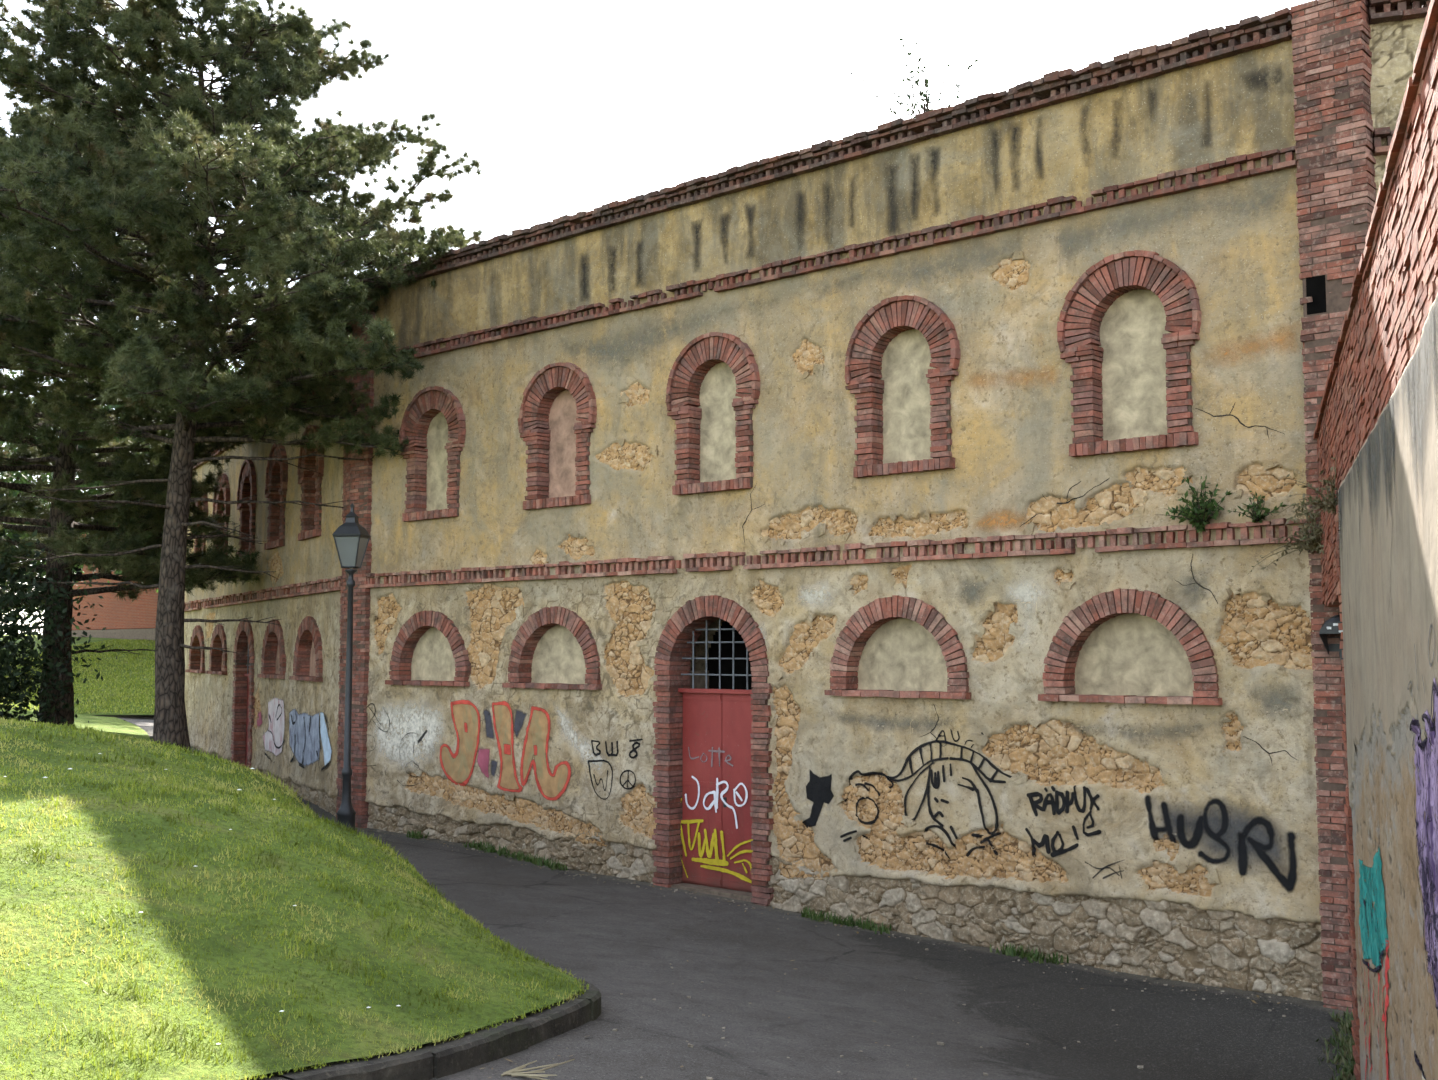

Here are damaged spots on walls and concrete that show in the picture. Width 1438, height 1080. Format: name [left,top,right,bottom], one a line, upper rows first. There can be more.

damp [994,127,1018,156]
damp [889,150,938,231]
damp [693,223,701,267]
crack [1195,403,1285,438]
spalling [761,505,968,545]
spalling [1024,465,1195,535]
spalling [969,600,1025,664]
spalling [1216,584,1314,677]
spalling [772,610,838,885]
spalling [968,718,1167,794]
spalling [833,771,1068,891]
spalling [1349,686,1438,1080]